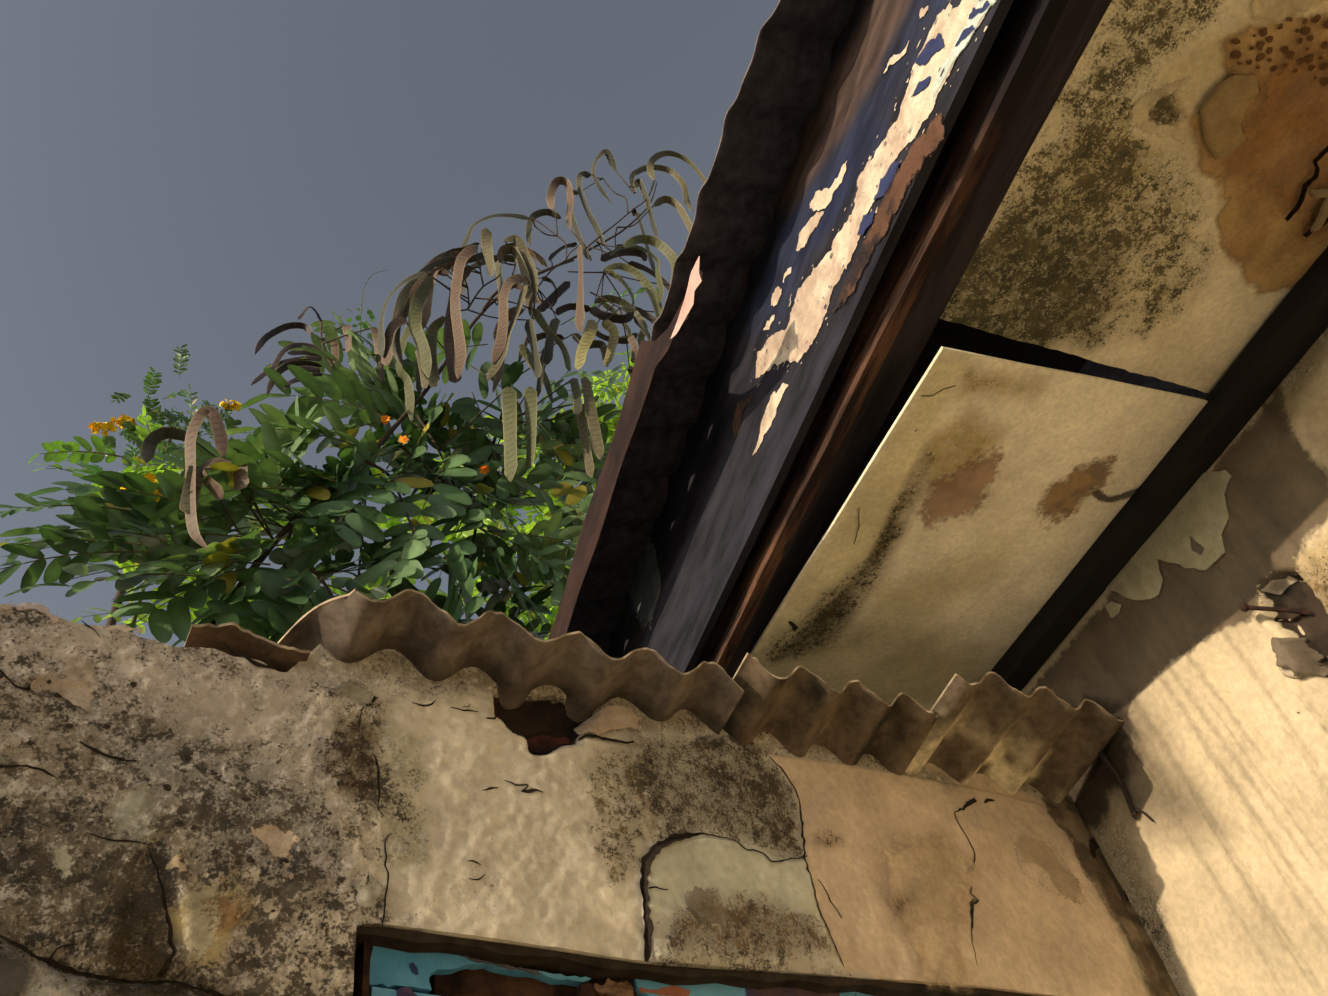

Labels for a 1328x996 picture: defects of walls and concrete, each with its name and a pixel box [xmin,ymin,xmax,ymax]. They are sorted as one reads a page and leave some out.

peeling [732,0,996,455]
water stain [1190,14,1328,293]
peeling [1031,386,1328,717]
spalling [493,697,639,755]
crack [0,833,225,996]
peeling [639,985,690,996]
water stain [586,736,804,887]
peeling [683,887,726,933]
peeling [746,987,840,996]
crack [954,798,995,965]